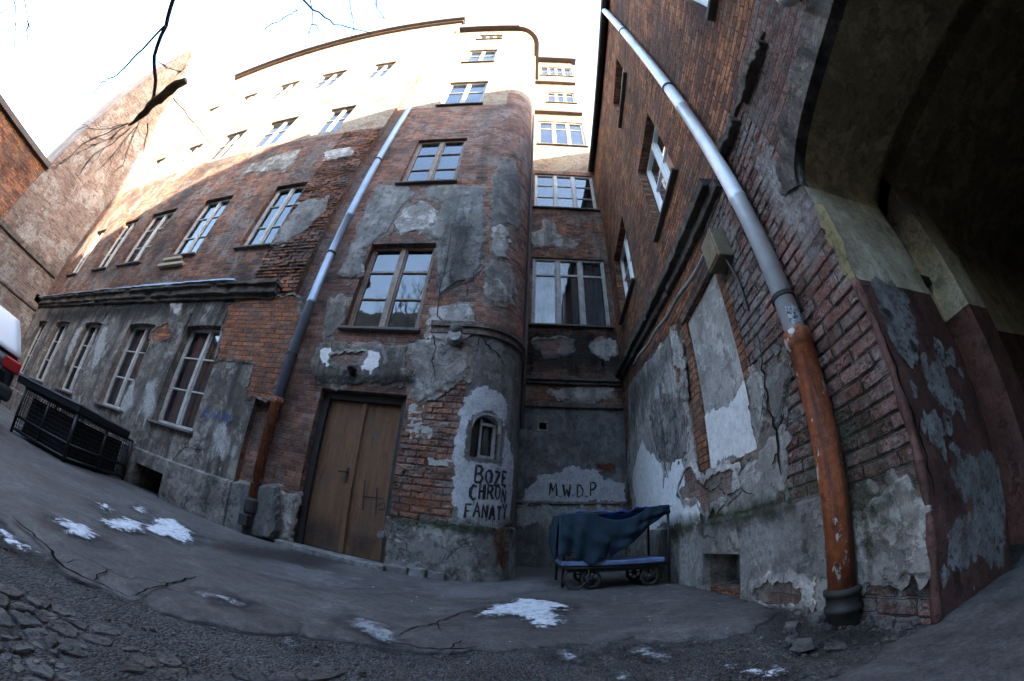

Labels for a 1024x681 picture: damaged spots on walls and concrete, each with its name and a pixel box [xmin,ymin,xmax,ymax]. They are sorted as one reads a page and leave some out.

peeling [243,149,301,174]
peeling [323,147,355,161]
peeling [272,196,330,247]
peeling [310,153,579,406]
crack [478,334,505,366]
peeling [546,324,793,521]
crack [757,333,784,475]
spalling [848,276,1006,598]
crack [13,517,196,597]
crack [390,608,481,650]